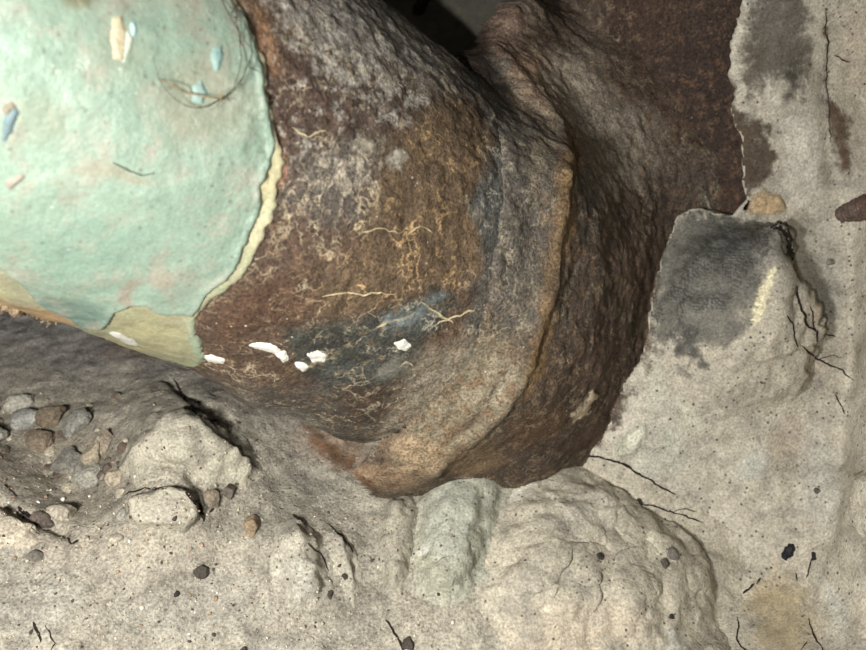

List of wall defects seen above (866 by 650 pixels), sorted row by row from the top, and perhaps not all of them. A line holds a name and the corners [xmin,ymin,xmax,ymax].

peeling [110,15,138,62]
damp [738,0,820,209]
corrosion [731,106,777,197]
efflorescence [751,265,777,327]
peeling [203,354,225,364]
peeling [249,342,326,372]
damp [669,318,708,368]
crack [786,286,854,414]
corrosion [558,393,630,455]
crack [185,487,214,522]
corrosion [304,425,374,491]
crack [589,455,703,523]